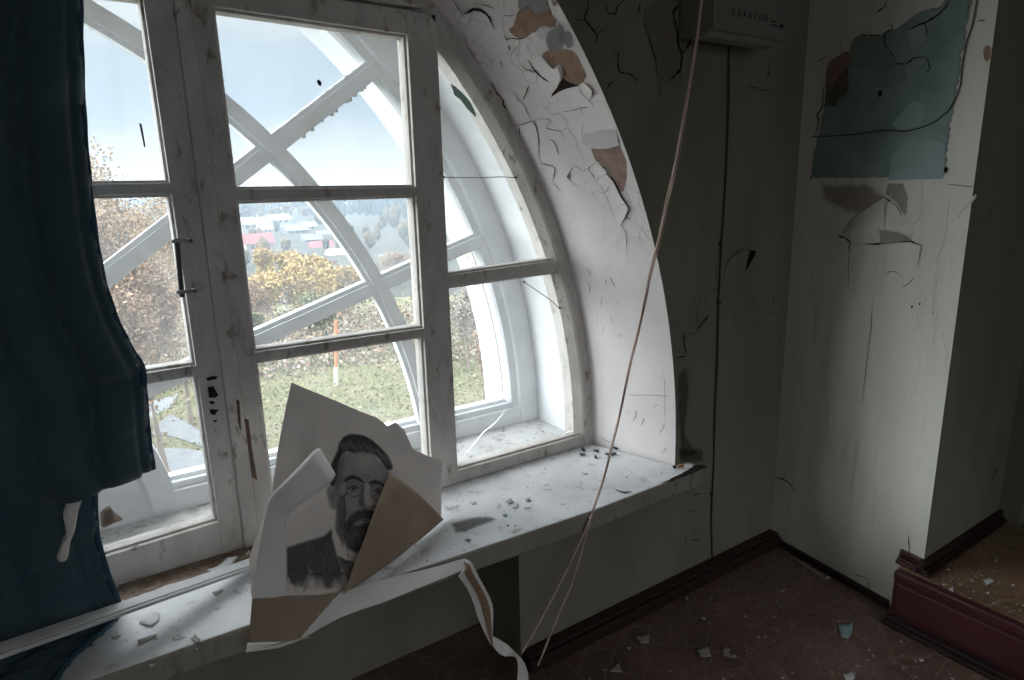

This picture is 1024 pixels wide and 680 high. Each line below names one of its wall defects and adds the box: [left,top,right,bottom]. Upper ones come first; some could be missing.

peeling [509,0,592,100]
peeling [504,93,539,160]
crack [453,0,691,248]
peeling [583,130,628,225]
peeling [206,376,219,422]
crack [633,267,717,453]